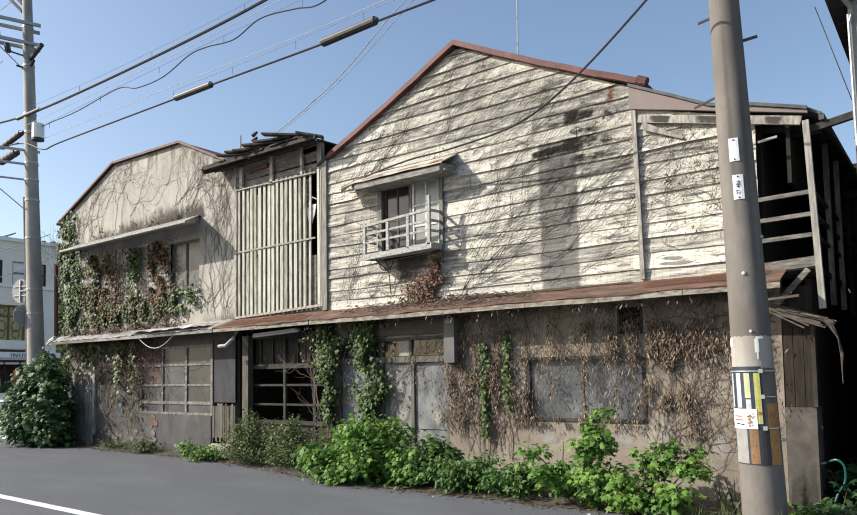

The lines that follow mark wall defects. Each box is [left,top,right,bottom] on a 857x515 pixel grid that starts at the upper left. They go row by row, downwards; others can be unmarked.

water stain [455,109,632,312]
corrosion [222,314,310,326]